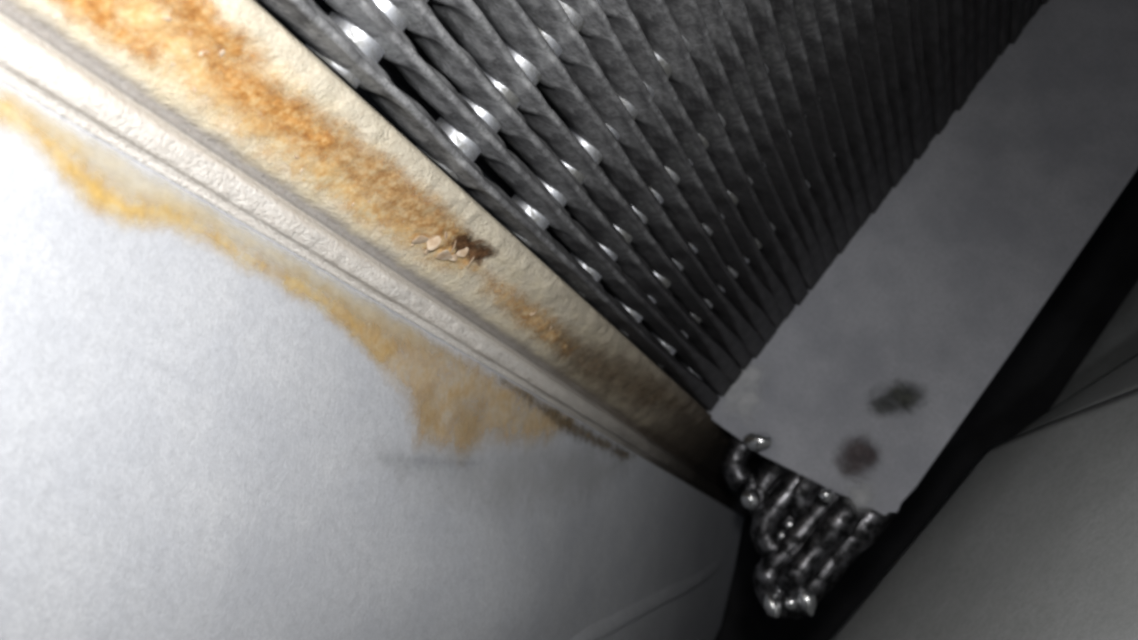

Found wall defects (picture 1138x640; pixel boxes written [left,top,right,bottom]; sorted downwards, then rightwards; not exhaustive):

rust [61,0,496,269]
water stain [0,93,559,447]
rust [519,390,628,459]